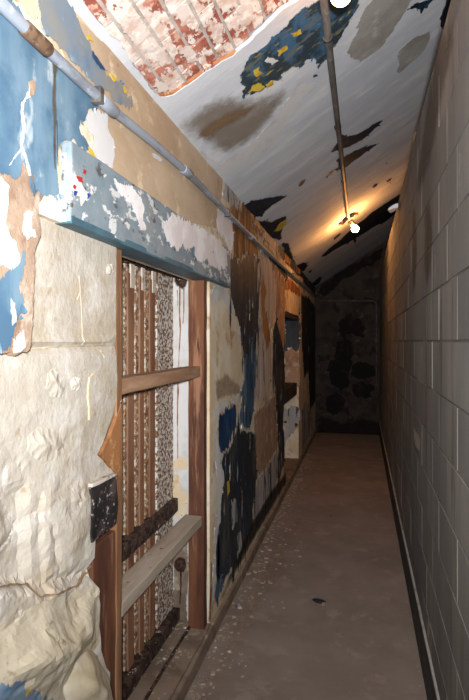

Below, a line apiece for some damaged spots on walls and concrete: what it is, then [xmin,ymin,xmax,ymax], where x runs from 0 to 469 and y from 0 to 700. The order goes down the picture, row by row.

flaking render [83,0,291,96]
damp [189,97,281,150]
peeling [326,120,383,178]
peeling [0,13,116,354]
peeling [113,178,146,230]
peeling [321,195,400,257]
peeling [163,183,383,620]
crack [0,565,92,597]